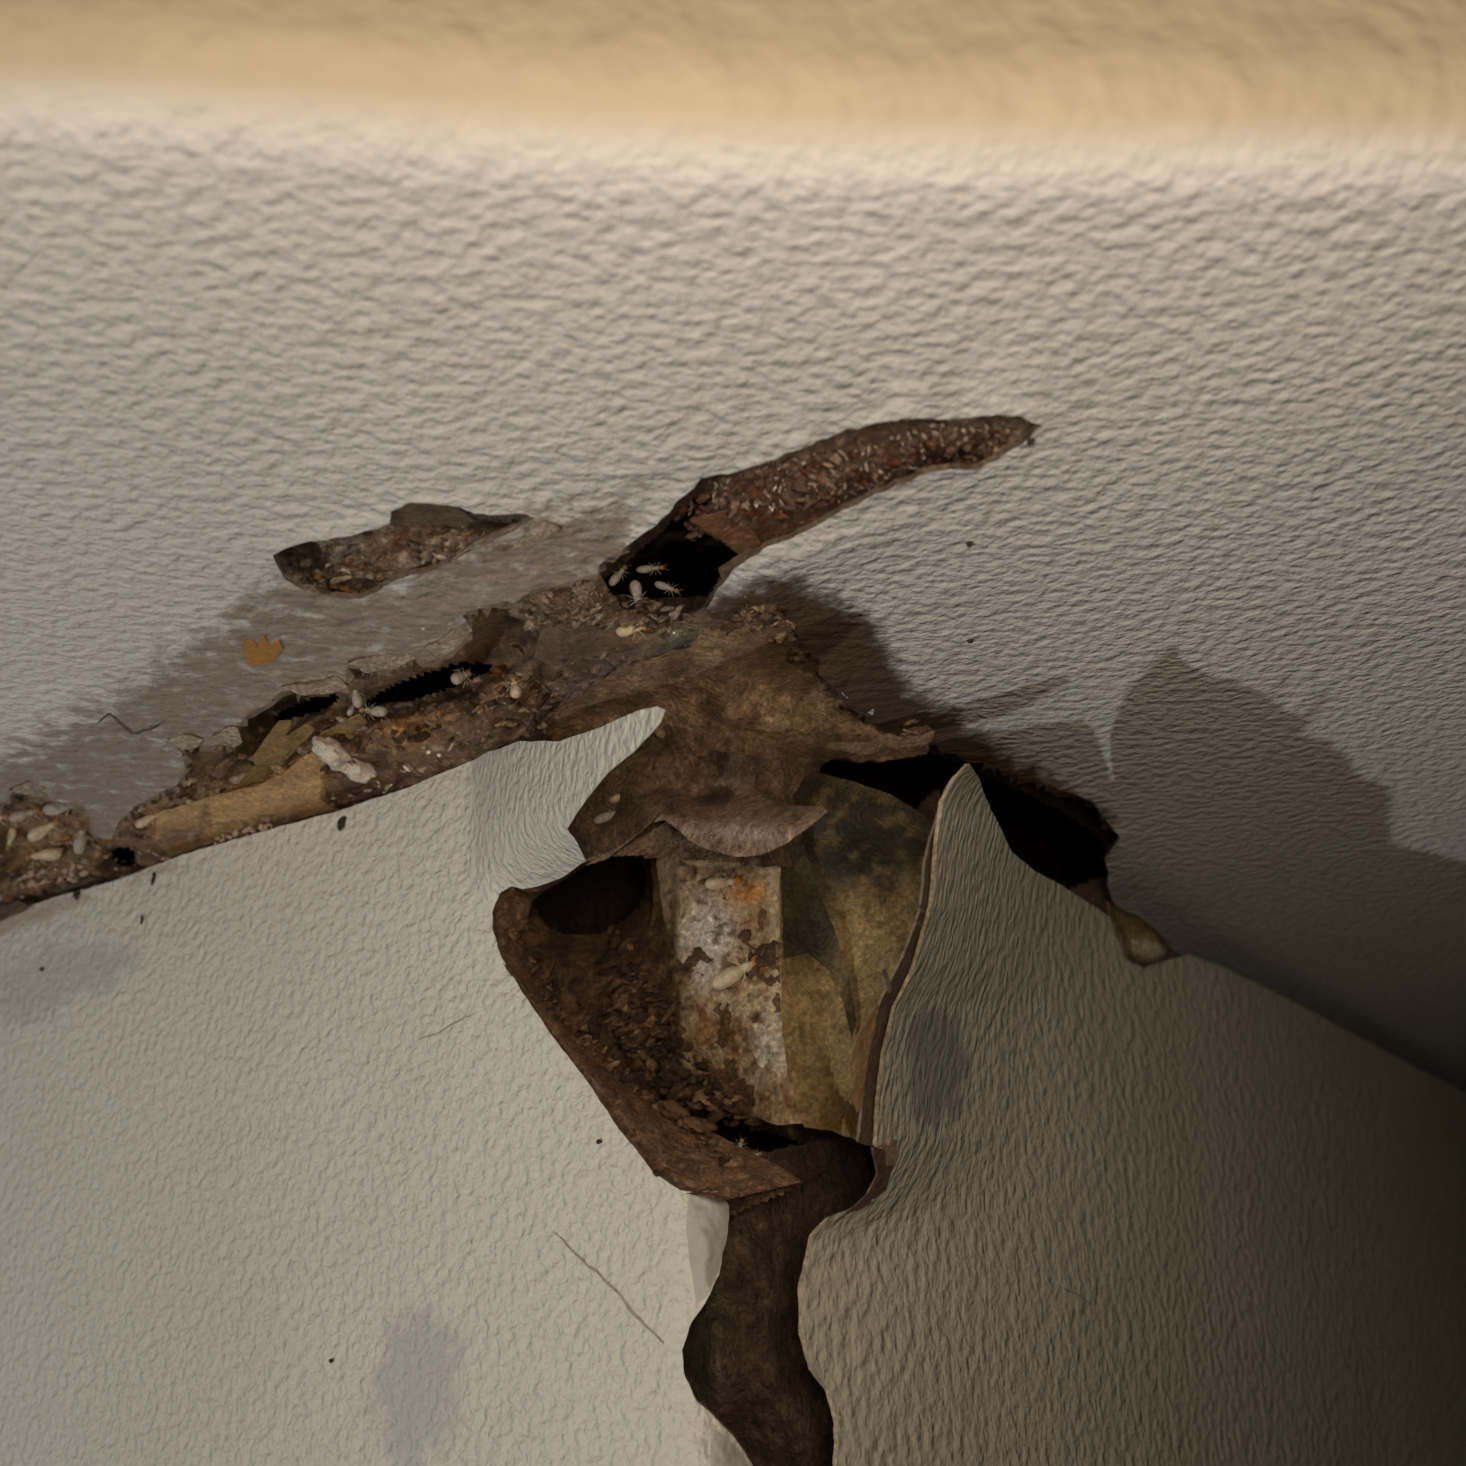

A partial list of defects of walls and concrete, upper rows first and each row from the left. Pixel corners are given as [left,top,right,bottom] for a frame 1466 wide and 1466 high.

spalling [275,503,562,594]
spalling [598,414,1035,633]
peeling [244,635,283,666]
spalling [916,789,941,826]
spalling [927,745,1118,916]
spalling [492,725,844,1216]
crack [553,1136,872,1466]